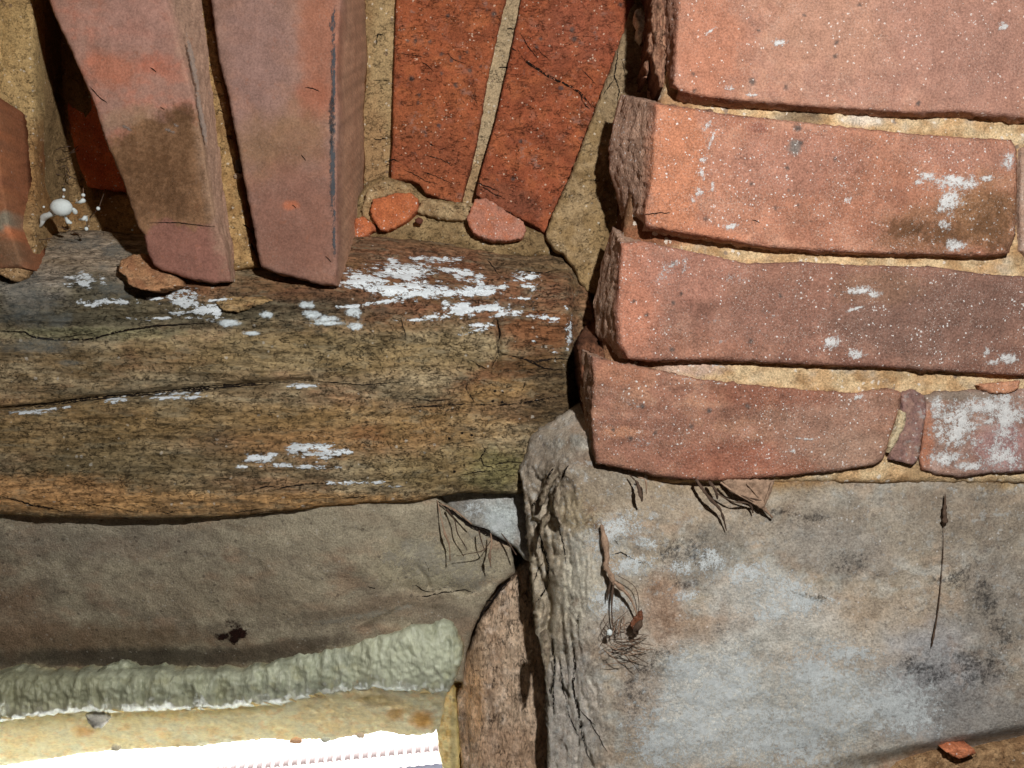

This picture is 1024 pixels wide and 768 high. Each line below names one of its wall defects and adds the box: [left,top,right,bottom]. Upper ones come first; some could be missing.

damp [915,173,992,251]
damp [63,271,259,336]
damp [299,255,572,353]
crack [0,318,573,410]
damp [237,442,353,470]
damp [928,394,1024,472]